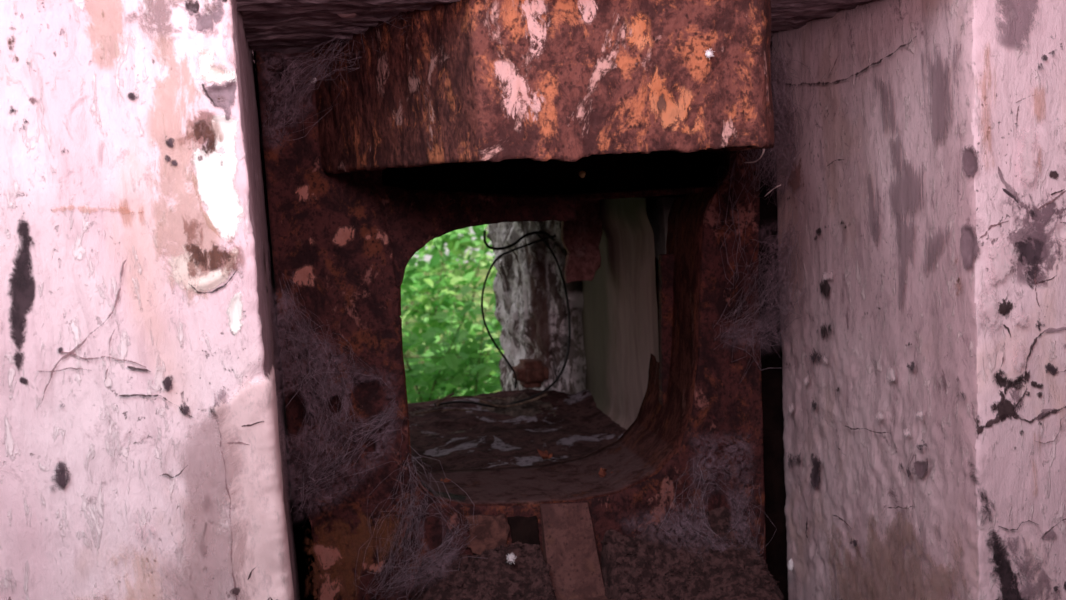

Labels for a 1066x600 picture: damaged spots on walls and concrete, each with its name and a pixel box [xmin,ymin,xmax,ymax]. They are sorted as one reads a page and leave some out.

spalling [169,0,243,334]
corrosion [626,14,652,50]
corrosion [643,67,703,133]
crack [784,36,916,86]
damp [8,220,35,384]
crack [39,259,196,434]
crack [976,324,1066,444]
damp [968,463,1061,600]